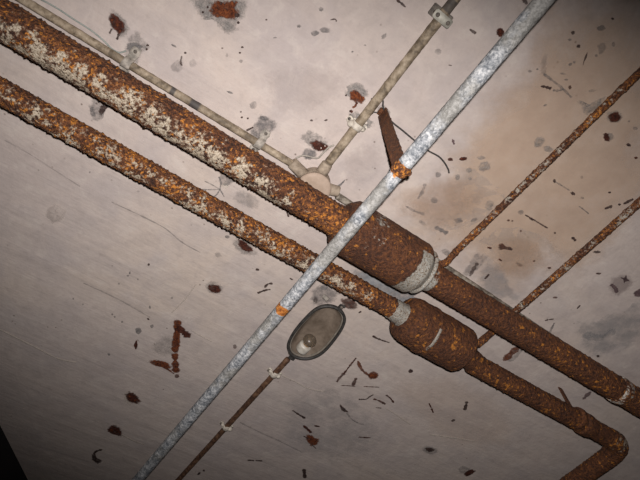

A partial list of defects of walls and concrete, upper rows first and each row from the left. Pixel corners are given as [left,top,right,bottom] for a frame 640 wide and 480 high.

corrosion [150,320,191,378]
corrosion [336,358,394,409]